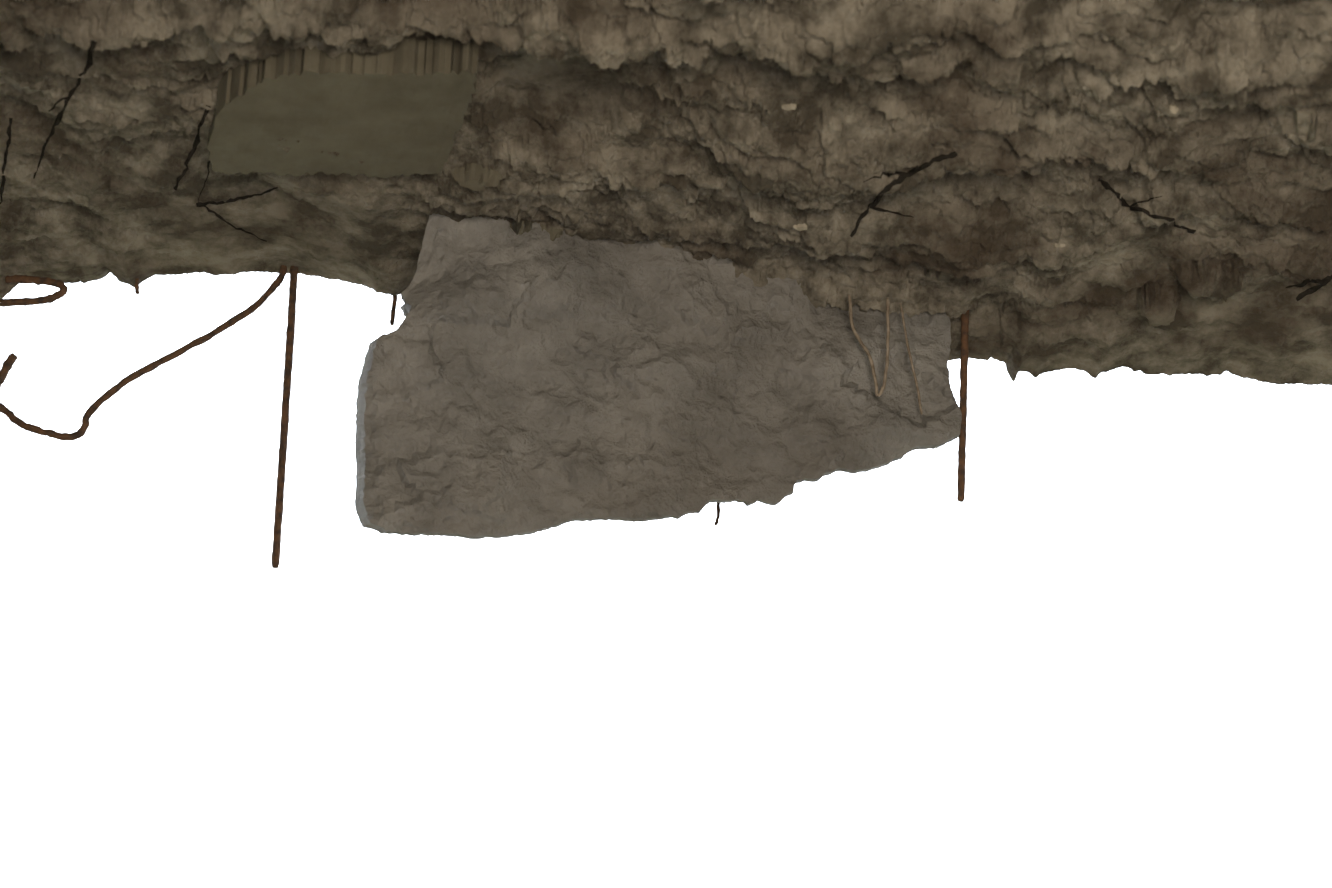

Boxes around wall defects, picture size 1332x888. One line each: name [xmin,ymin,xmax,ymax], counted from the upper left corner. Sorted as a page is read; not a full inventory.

spalling [0,0,1332,568]